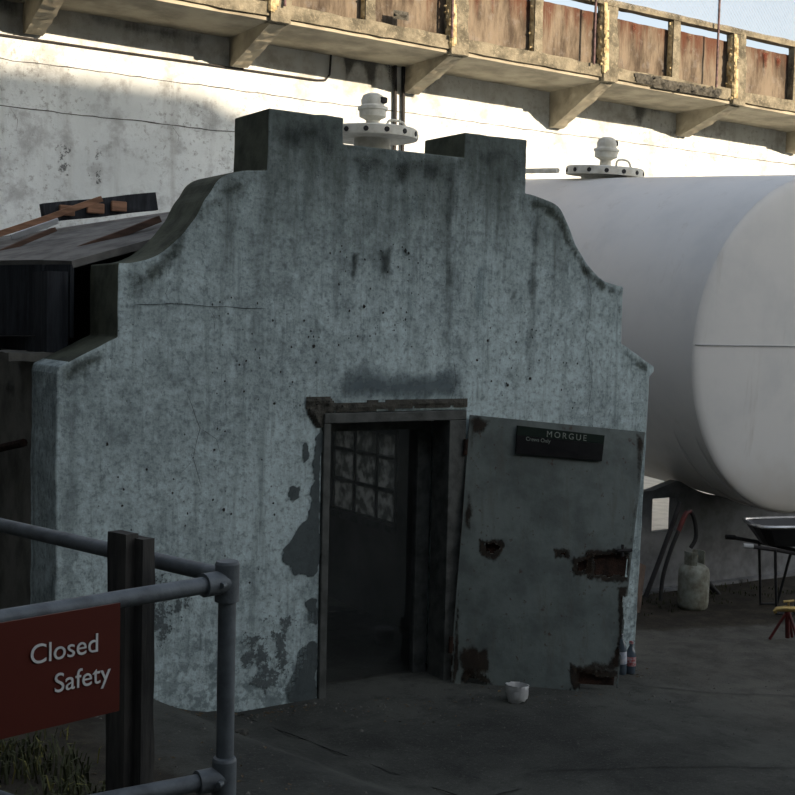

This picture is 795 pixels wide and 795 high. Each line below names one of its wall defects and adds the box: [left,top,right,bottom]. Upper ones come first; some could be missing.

crack [0,105,235,139]
peeling [282,396,468,577]